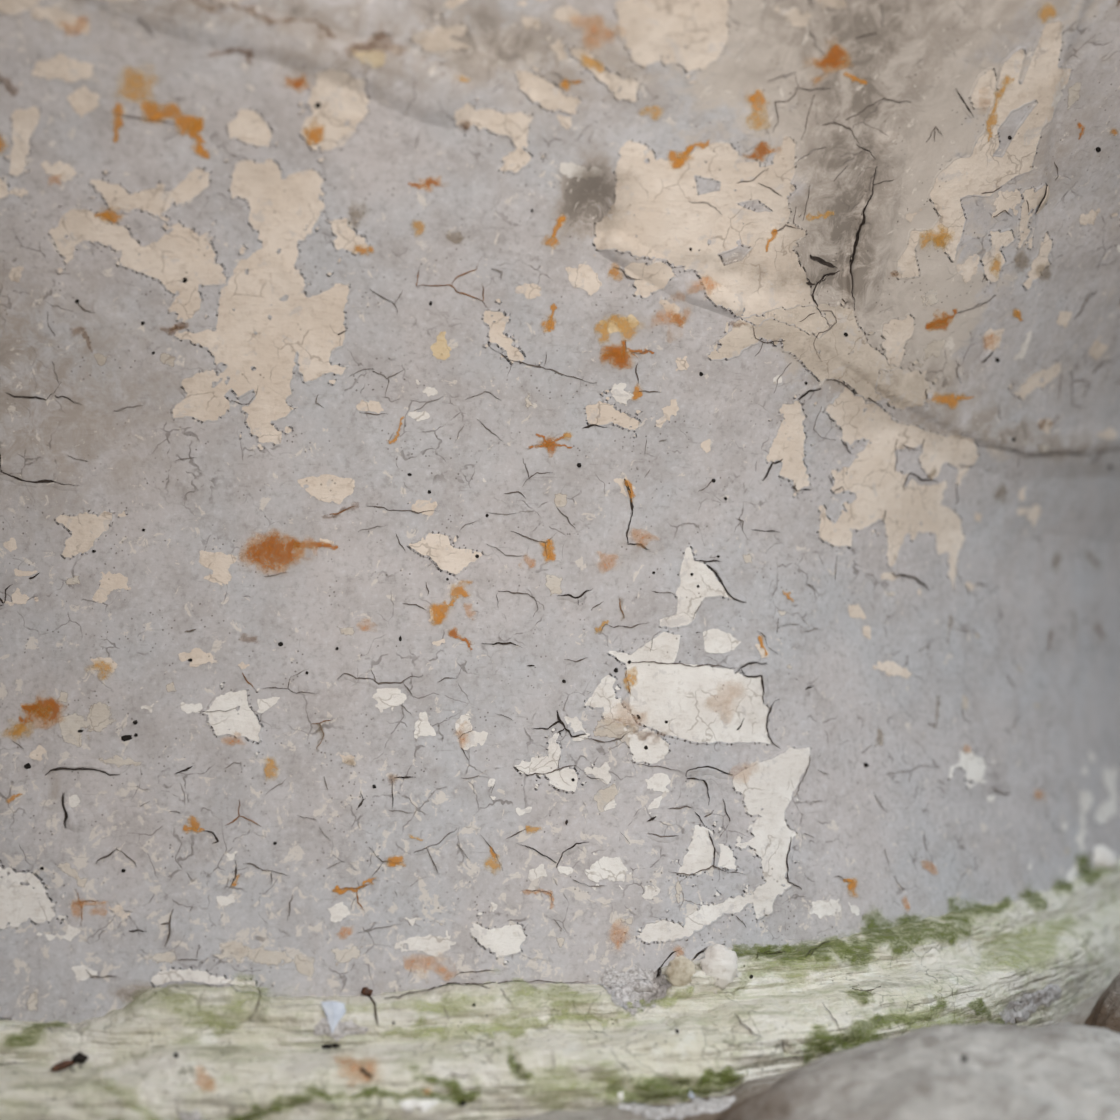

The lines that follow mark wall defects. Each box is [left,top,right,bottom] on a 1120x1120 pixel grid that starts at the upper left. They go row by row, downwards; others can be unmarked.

corrosion [113,70,209,158]
peeling [0,49,386,451]
crack [738,72,910,453]
corrosion [595,315,654,368]
peeling [559,134,980,591]
crack [0,455,86,491]
crack [622,439,667,550]
corrosion [245,532,338,570]
peeling [512,545,821,945]
damp [732,938,852,966]
damp [804,997,946,1063]
damp [607,1069,743,1105]